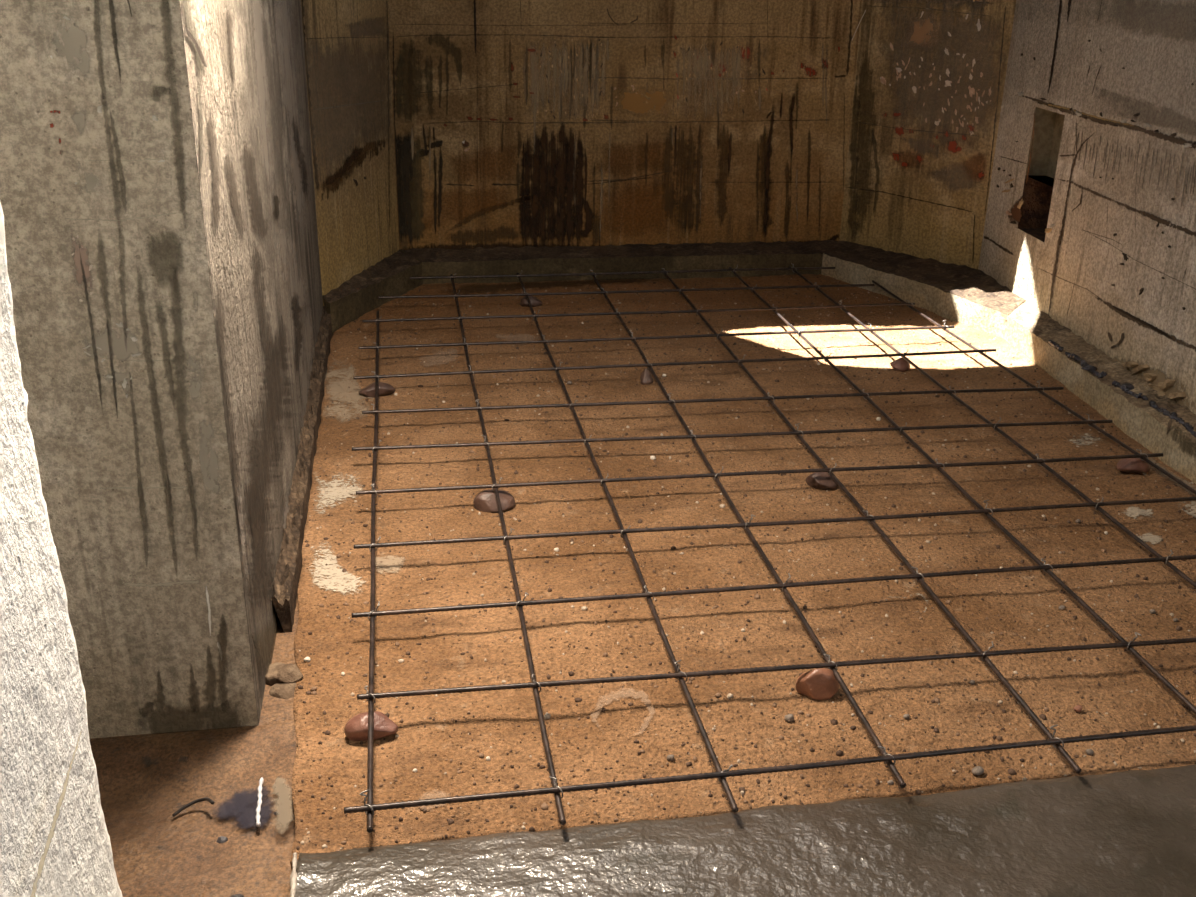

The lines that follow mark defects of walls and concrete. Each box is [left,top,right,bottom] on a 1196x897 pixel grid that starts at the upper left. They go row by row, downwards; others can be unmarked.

leakage [94,0,132,214]
leakage [153,0,186,214]
leakage [292,17,613,249]
leakage [662,92,732,232]
leakage [756,41,821,242]
leakage [828,59,879,241]
leakage [81,234,198,570]
leakage [208,111,302,607]
leakage [309,543,366,595]
leakage [314,475,363,514]
leakage [325,364,373,421]
leakage [375,555,405,574]